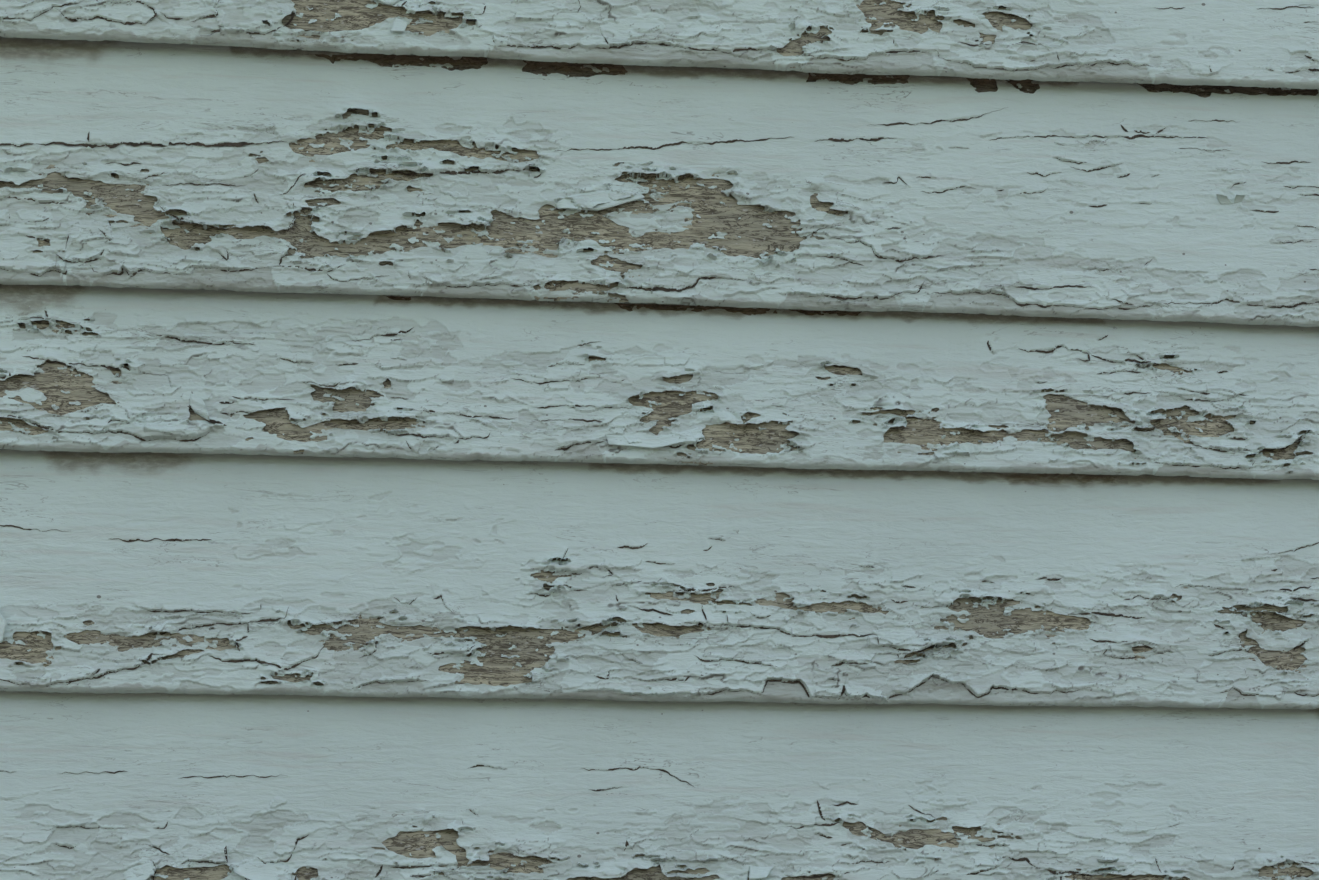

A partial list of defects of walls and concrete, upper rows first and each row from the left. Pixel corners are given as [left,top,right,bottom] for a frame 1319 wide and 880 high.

peeling [246,0,1149,94]
crack [395,107,1235,207]
peeling [0,102,902,316]
crack [1012,268,1319,308]
peeling [0,307,156,449]
peeling [175,378,490,454]
peeling [556,367,812,466]
peeling [850,387,1319,473]
crack [531,543,955,681]
crack [1072,584,1226,659]
crack [785,800,889,879]
crack [936,844,1111,880]